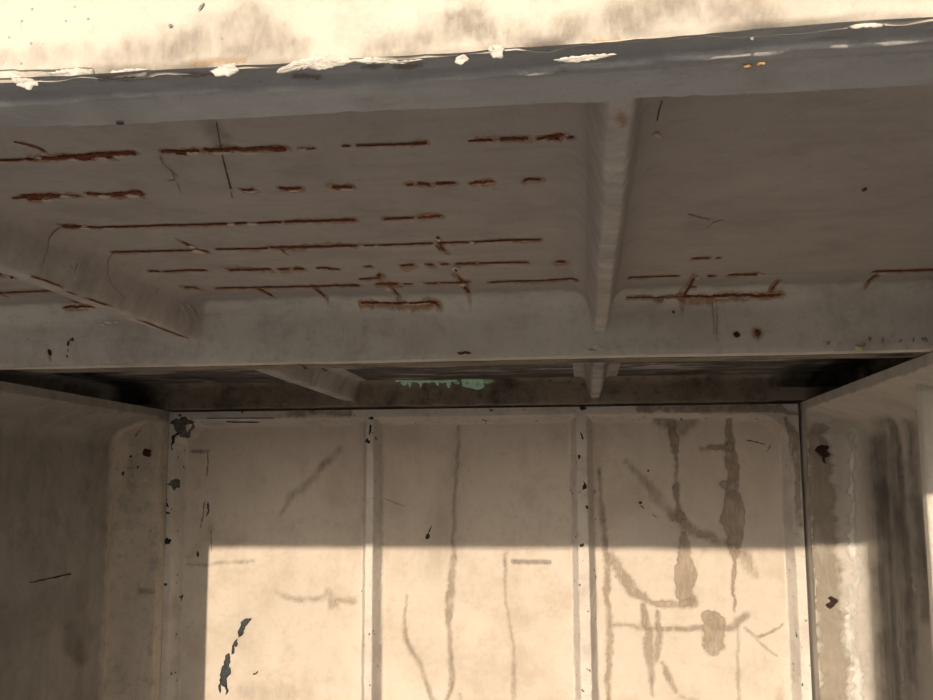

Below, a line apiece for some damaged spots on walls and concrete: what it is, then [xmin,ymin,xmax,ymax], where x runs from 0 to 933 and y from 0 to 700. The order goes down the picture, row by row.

leakage [781,358,869,387]
peeling [170,416,195,450]
leakage [603,404,865,700]
leakage [914,499,927,597]
leakage [446,574,454,635]
peeling [218,618,252,694]